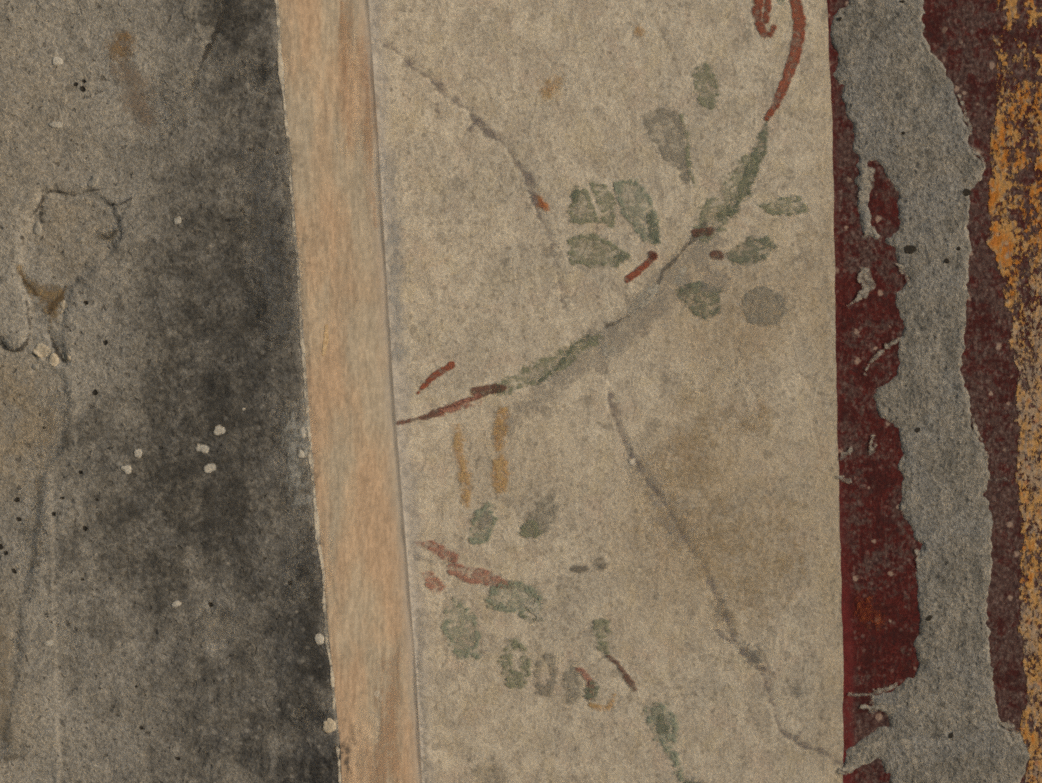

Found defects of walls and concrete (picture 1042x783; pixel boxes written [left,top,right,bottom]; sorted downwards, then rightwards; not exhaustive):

crack [188,2,226,92]
crack [386,45,541,218]
crack [21,189,132,240]
crack [0,301,66,362]
spalling [830,0,1042,783]
efflorescence [282,412,311,506]
crack [608,392,662,498]
crack [717,616,841,764]